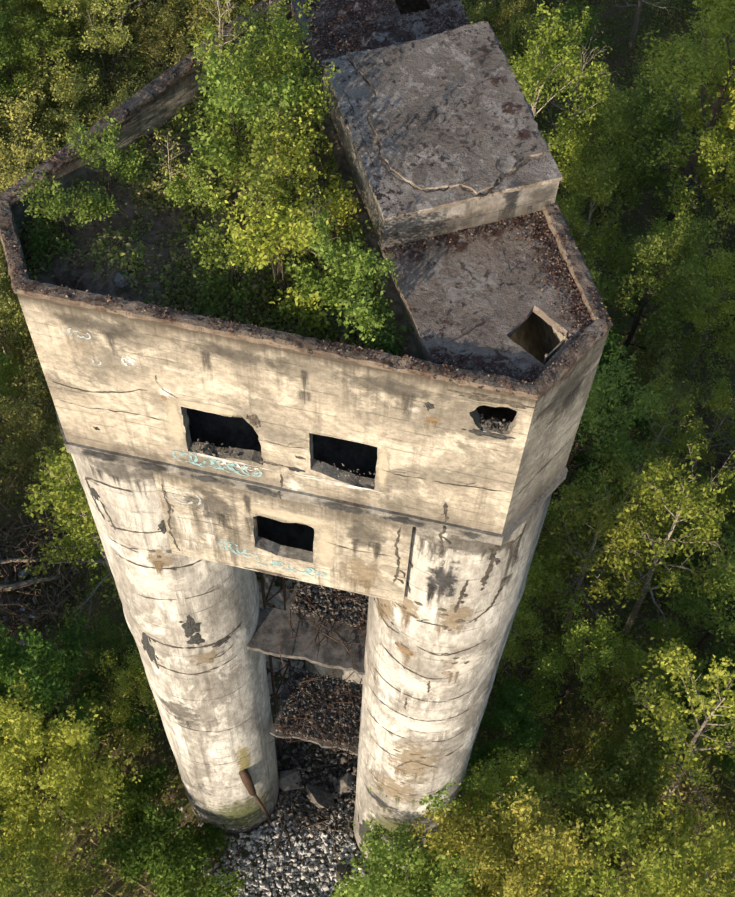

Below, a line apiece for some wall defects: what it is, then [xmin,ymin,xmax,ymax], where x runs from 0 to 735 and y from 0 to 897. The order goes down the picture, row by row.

crack [342,60,538,197]
crack [85,477,243,570]
damp [387,517,518,602]